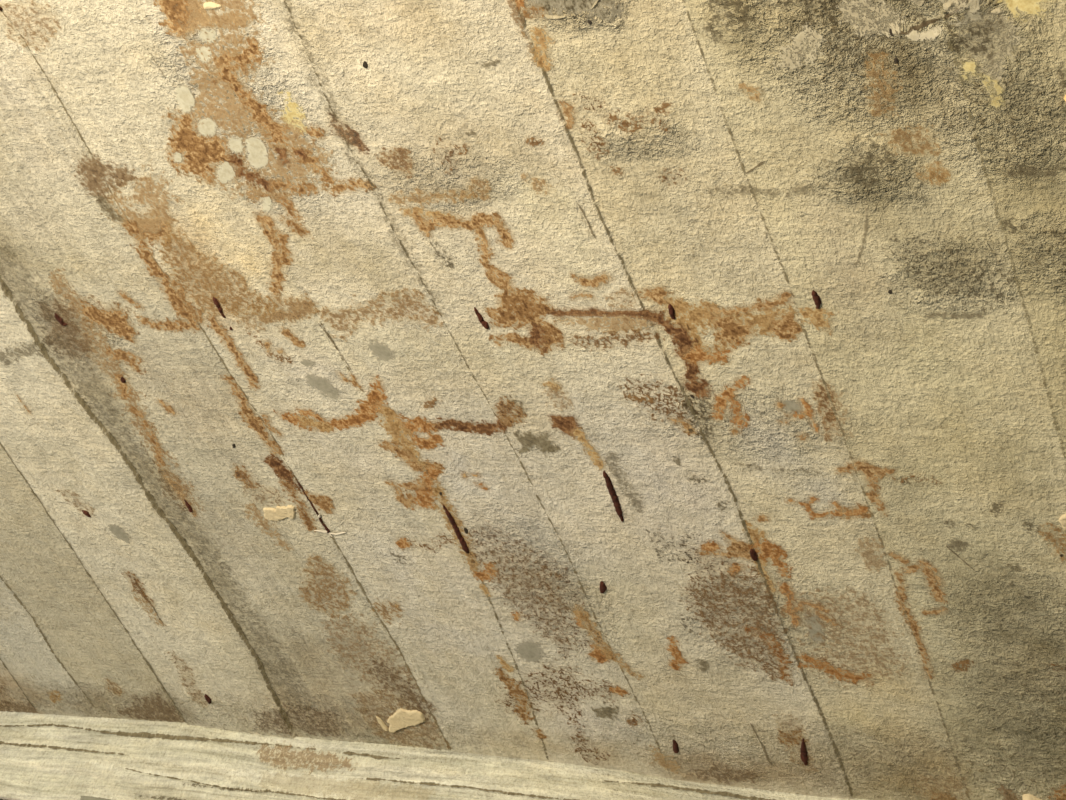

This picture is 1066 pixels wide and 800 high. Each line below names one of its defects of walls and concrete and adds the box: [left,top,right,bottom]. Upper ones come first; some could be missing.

peeling [991,0,1052,22]
water stain [961,59,1002,108]
rust [559,94,672,159]
rust [376,147,839,439]
rust [49,0,643,766]
rust [776,380,851,441]
peeling [263,505,296,521]
rust [788,461,941,520]
rust [679,515,947,687]
rust [666,636,689,670]
rust [953,659,974,672]
peeling [376,708,425,733]